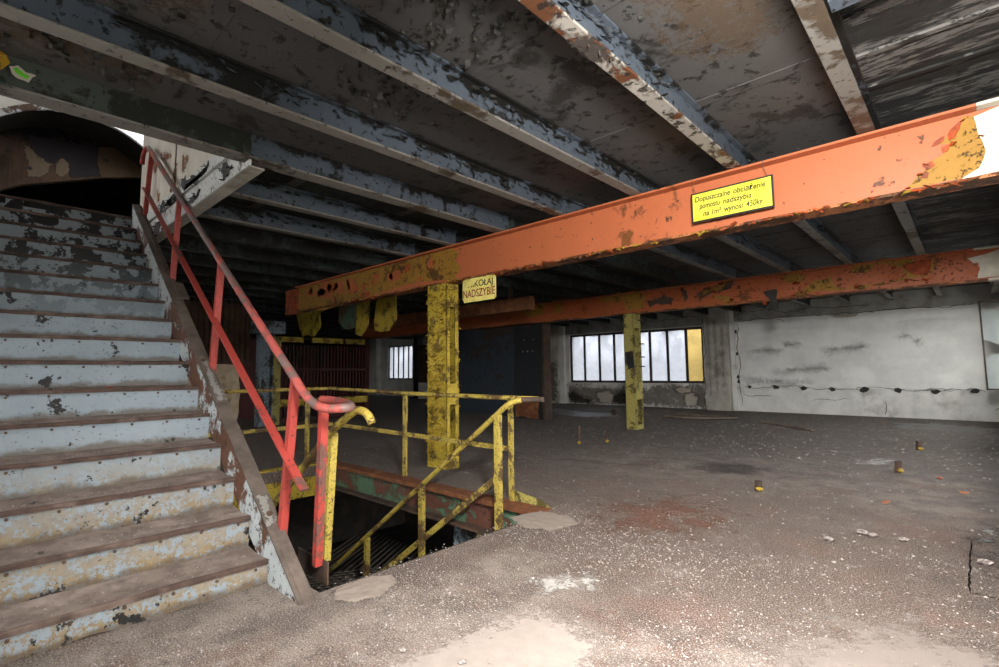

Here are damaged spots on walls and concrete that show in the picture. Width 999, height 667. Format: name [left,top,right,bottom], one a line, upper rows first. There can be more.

peeling [316,0,345,25]
peeling [0,65,36,94]
peeling [29,31,200,96]
peeling [337,61,434,156]
peeling [358,0,636,178]
corrosion [569,37,614,67]
peeling [558,0,674,96]
peeling [23,134,138,178]
peeling [893,116,986,197]
peeling [152,160,233,237]
peeling [199,355,228,403]
crack [967,540,999,600]